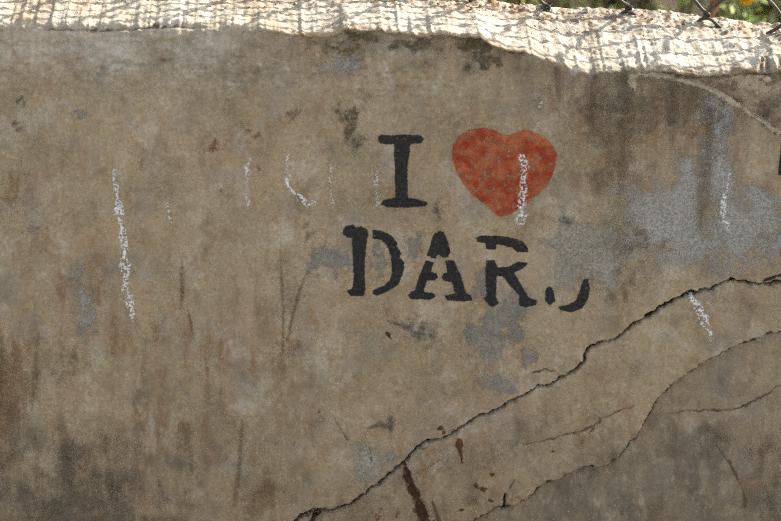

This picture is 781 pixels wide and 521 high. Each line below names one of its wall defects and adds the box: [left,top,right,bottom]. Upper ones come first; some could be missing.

peeling [539,56,781,289]
crack [729,274,781,283]
crack [634,288,699,322]
crack [533,344,594,373]
crack [541,389,667,442]
crack [679,387,775,413]